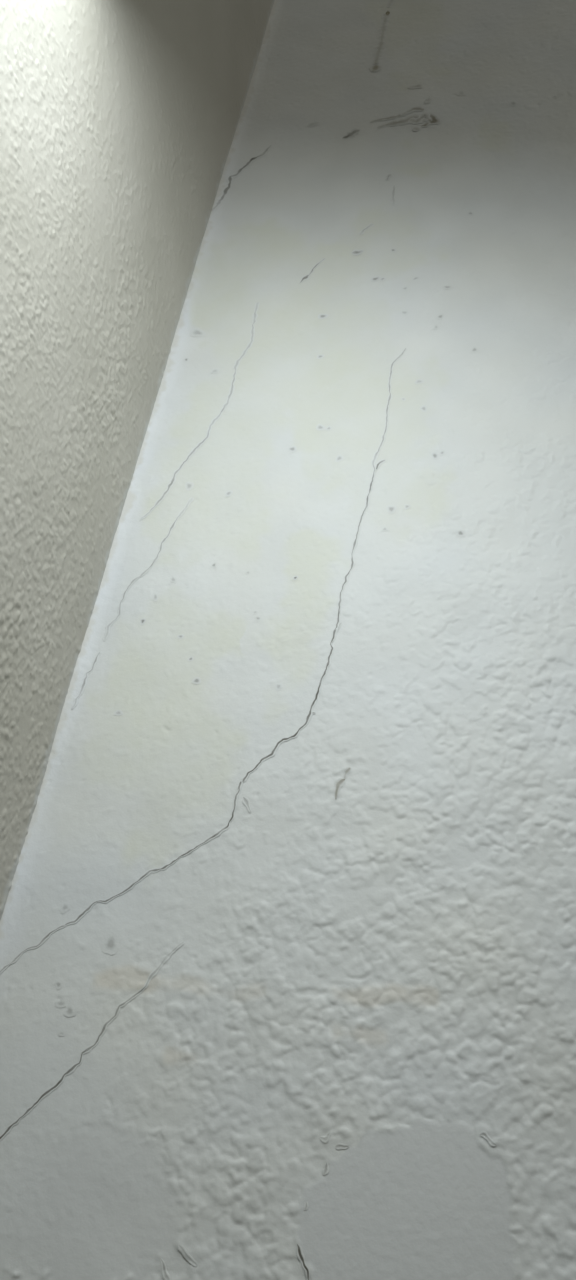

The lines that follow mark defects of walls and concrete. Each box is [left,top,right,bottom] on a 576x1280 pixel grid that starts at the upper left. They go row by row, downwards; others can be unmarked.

crack [0,302,407,974]
crack [0,941,185,1141]
peeling [296,1244,311,1280]